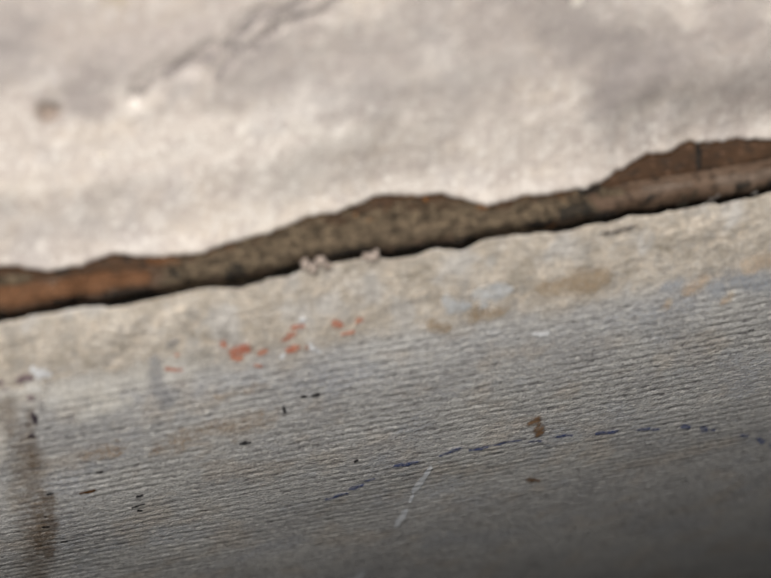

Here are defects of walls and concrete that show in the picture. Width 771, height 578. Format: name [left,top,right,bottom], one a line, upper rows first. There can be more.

spalling [628,138,757,166]
spalling [248,194,481,239]
rust [0,257,180,311]